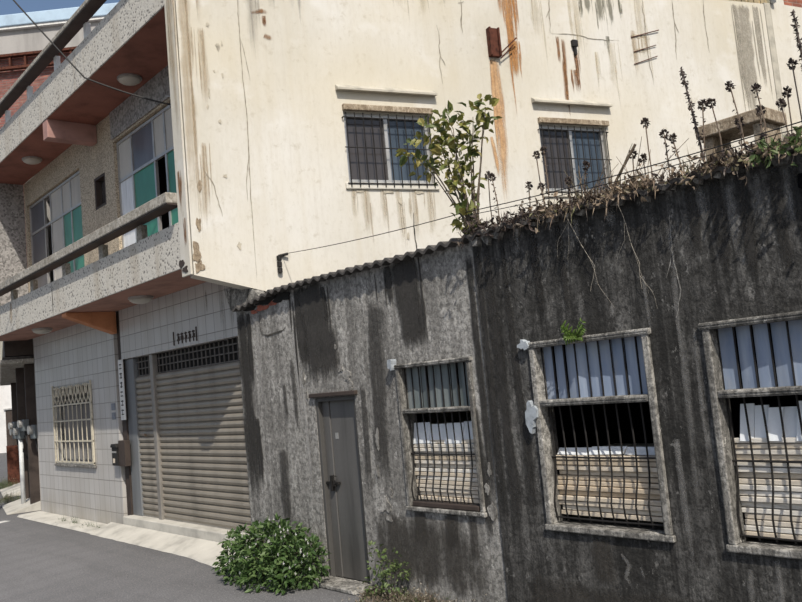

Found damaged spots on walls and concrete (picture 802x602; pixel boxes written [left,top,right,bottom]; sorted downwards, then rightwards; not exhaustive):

corrosion [490,60,507,188]
corrosion [498,0,522,102]
corrosion [556,38,581,100]
damp [238,313,263,487]
damp [283,283,340,422]
damp [360,257,427,477]
damp [466,243,534,531]
damp [280,451,290,518]
damp [378,511,479,593]